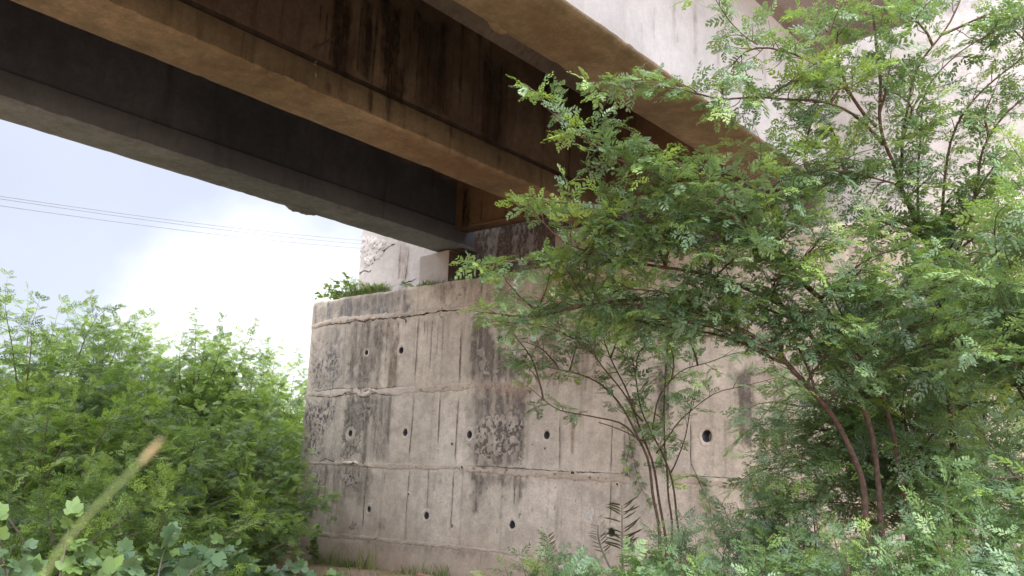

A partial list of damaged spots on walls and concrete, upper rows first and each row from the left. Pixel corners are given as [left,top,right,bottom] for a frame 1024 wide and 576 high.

leakage [320,0,448,113]
leakage [315,291,410,488]
leakage [470,321,527,513]